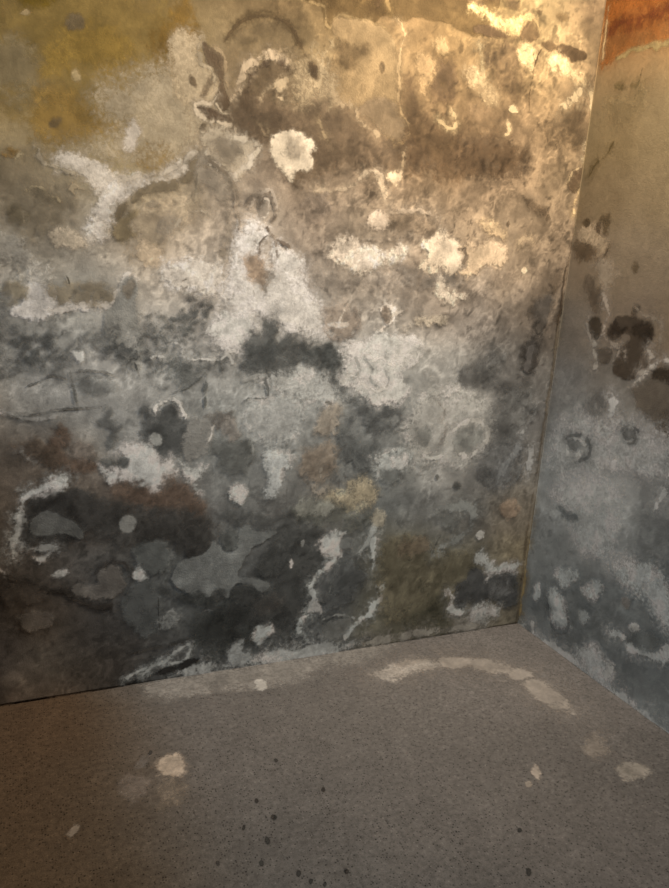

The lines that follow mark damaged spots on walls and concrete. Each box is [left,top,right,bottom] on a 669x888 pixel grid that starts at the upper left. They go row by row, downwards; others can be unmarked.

rust [601,0,669,69]
damp [541,109,589,150]
damp [584,259,616,312]
crack [0,369,116,421]
crack [174,372,208,408]
crack [244,379,269,401]
damp [0,10,579,719]
damp [544,392,669,666]
damp [518,619,654,722]
damp [616,762,650,781]